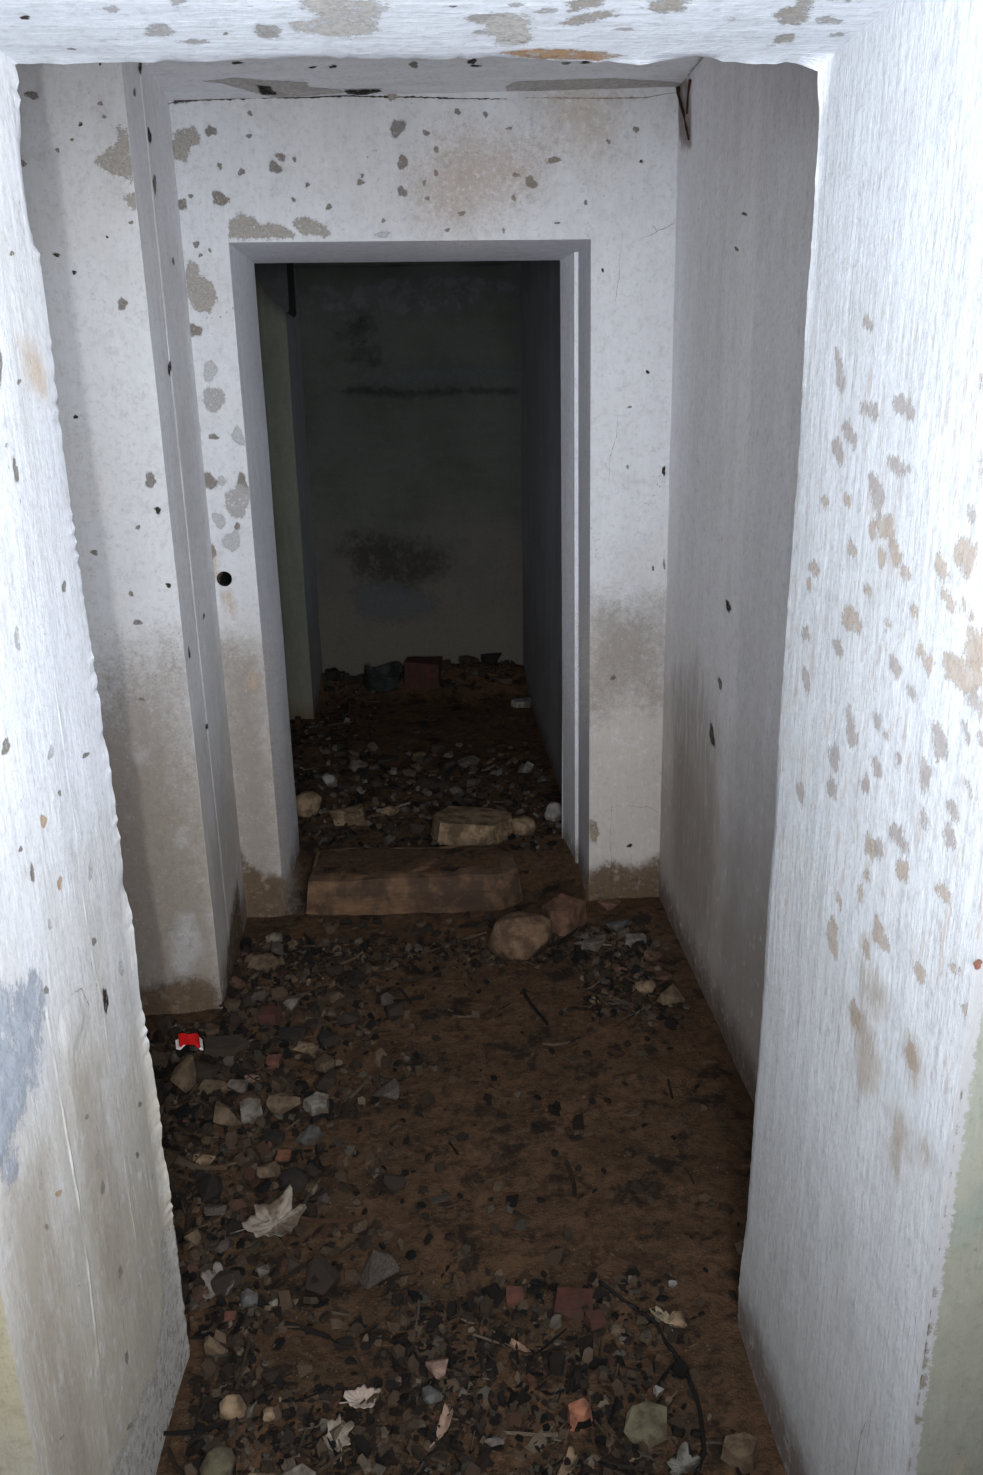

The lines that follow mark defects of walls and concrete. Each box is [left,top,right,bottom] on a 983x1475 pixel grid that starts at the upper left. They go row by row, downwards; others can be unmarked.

corrosion [500,49,622,61]